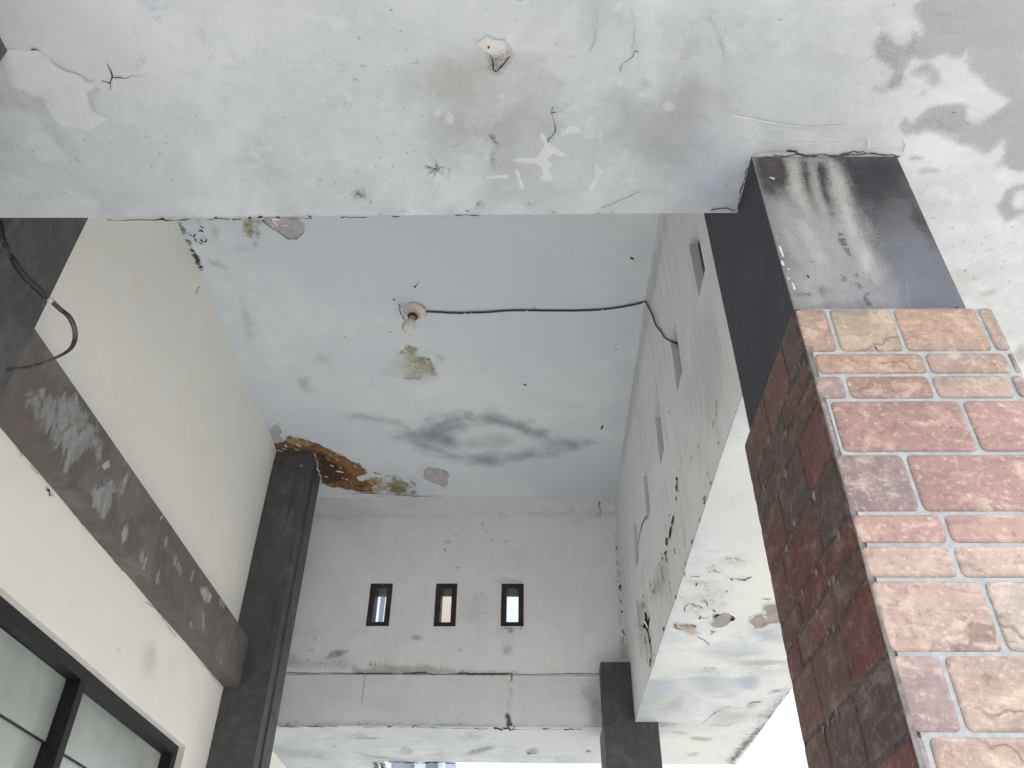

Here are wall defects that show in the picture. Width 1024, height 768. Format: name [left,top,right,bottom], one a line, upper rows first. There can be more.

peeling [2,48,110,132]
crack [103,64,144,90]
spalling [476,36,515,77]
crack [620,10,638,71]
spalling [260,216,308,241]
damp [623,0,1024,455]
damp [377,344,453,385]
damp [339,408,604,467]
corrosion [274,436,426,497]
spalling [420,465,451,488]
spalling [699,599,780,629]